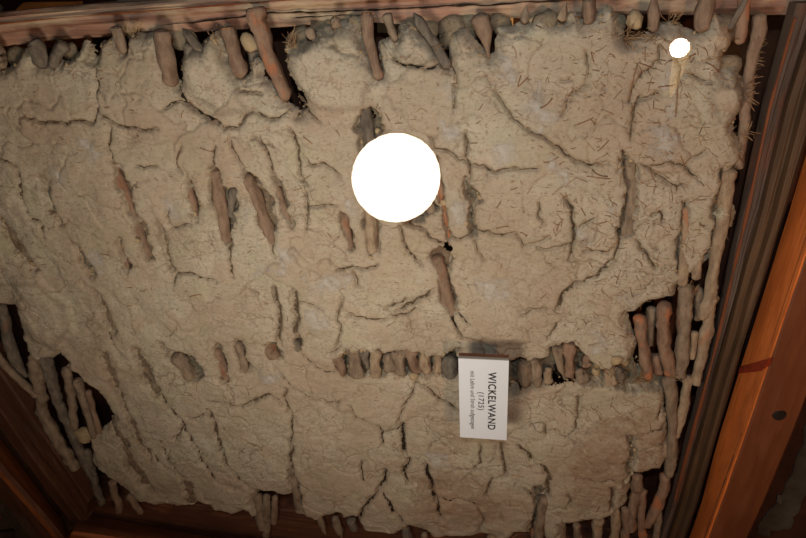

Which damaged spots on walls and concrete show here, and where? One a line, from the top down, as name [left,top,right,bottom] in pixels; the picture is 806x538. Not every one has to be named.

crack [394,58,457,103]
crack [24,68,157,159]
crack [166,85,338,224]
spalling [395,161,446,218]
spalling [0,218,35,266]
crack [401,199,656,336]
crack [275,286,433,372]
spalling [342,349,370,370]
spalling [417,348,459,370]
spalling [508,357,527,387]
spalling [541,346,604,377]
crack [155,375,552,530]